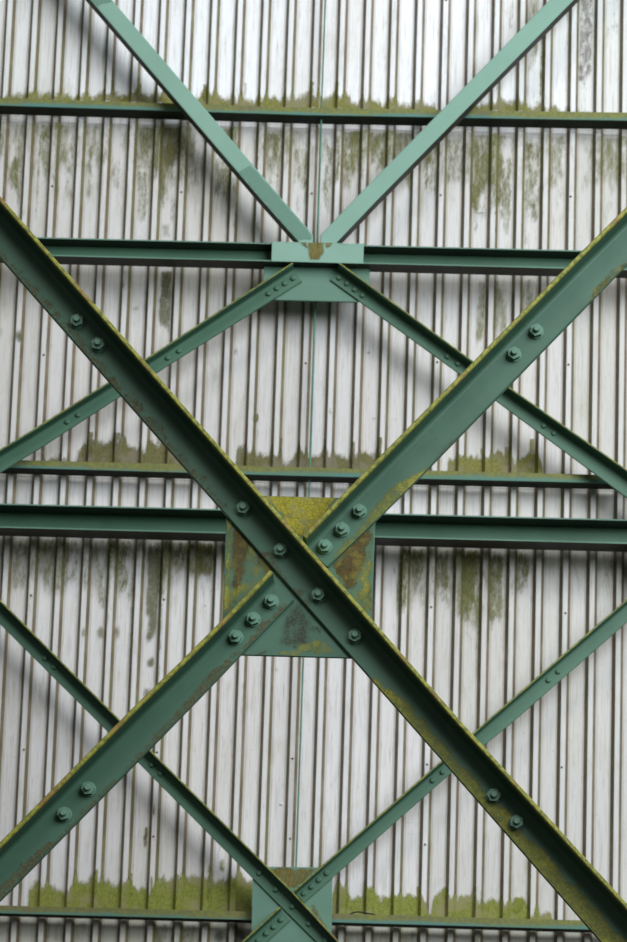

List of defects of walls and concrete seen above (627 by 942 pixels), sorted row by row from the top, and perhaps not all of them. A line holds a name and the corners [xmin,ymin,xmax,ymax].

rust [302,242,332,259]
rust [232,528,271,592]
rust [334,529,372,589]